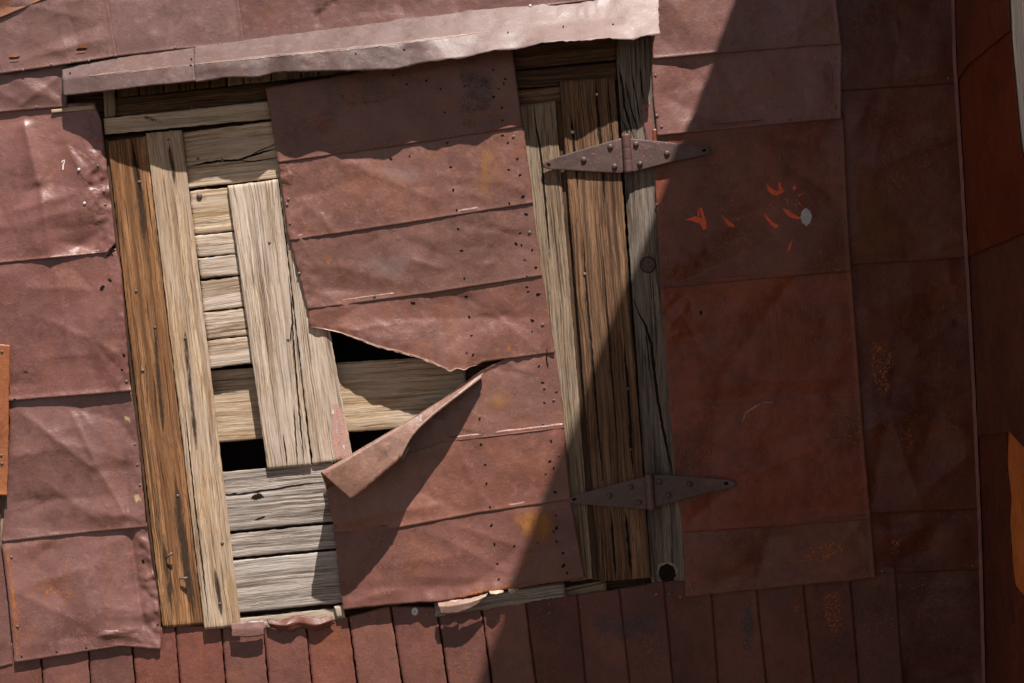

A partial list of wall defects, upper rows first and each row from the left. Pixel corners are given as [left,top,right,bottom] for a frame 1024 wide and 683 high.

crack [189,144,276,167]
crack [583,236,673,480]
peeling [321,373,484,500]